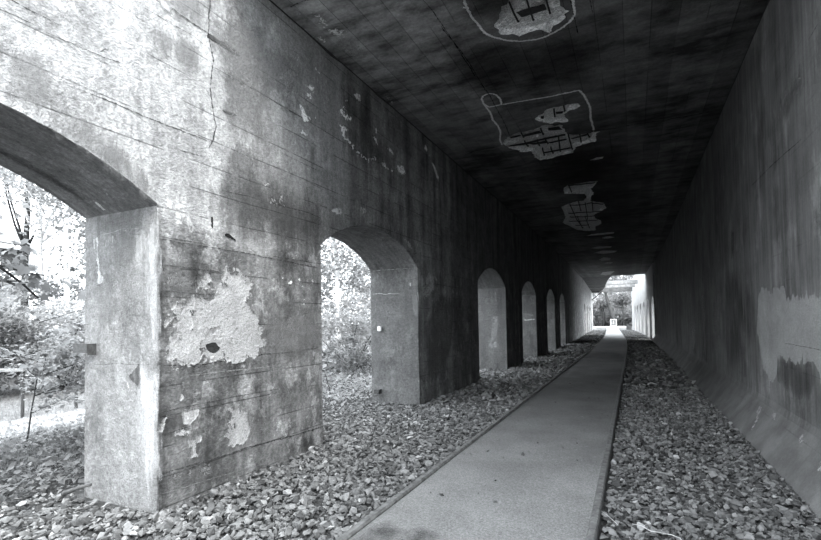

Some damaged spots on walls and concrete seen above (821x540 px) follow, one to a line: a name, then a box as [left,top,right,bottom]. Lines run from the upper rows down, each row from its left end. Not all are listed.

spalling [494,0,568,36]
crack [92,0,302,157]
peeling [339,92,406,174]
crack [269,0,581,277]
spalling [503,103,600,160]
spalling [562,181,616,261]
peeling [163,265,267,371]
peeling [757,285,821,383]
peeling [174,380,202,459]
peeling [224,407,254,447]